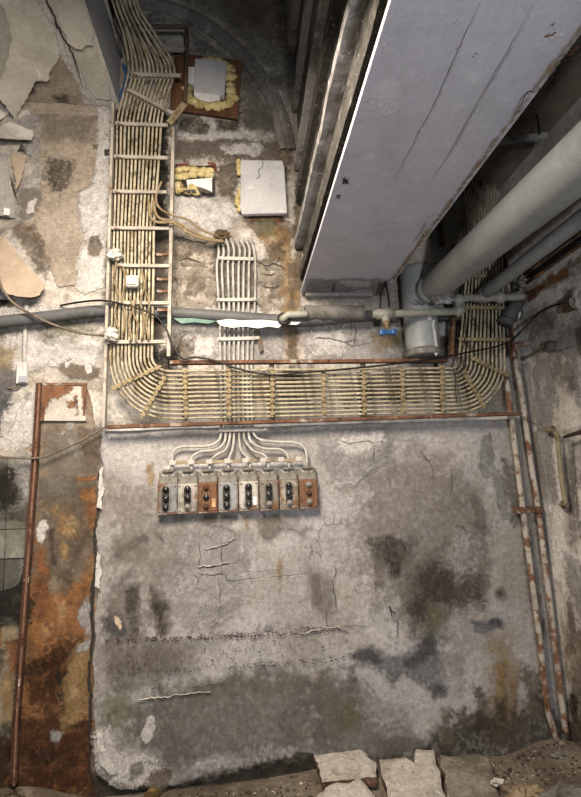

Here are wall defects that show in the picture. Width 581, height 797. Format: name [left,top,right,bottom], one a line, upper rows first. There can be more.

flaking render [0,0,112,294]
water stain [28,102,98,116]
crack [435,2,536,176]
flaking render [0,289,18,316]
corrosion [5,383,101,797]
crack [196,514,371,635]
water stain [86,457,581,797]